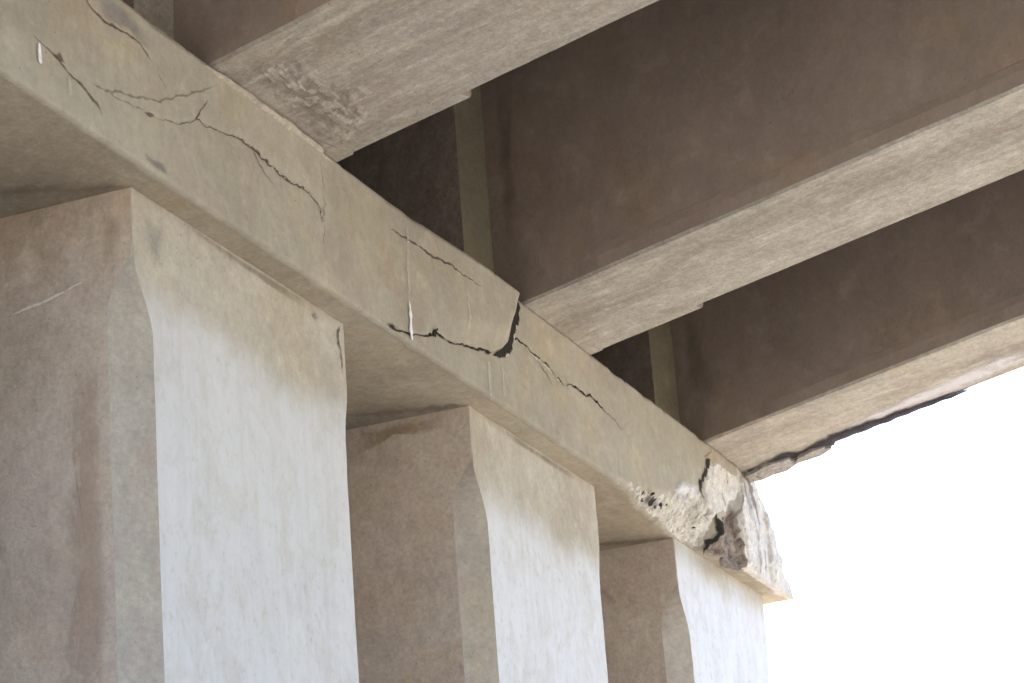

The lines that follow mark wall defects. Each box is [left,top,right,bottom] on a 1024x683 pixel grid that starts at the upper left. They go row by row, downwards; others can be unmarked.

crack [87,1,153,63]
crack [146,100,322,215]
crack [392,229,480,286]
crack [336,327,344,368]
crack [389,302,621,429]